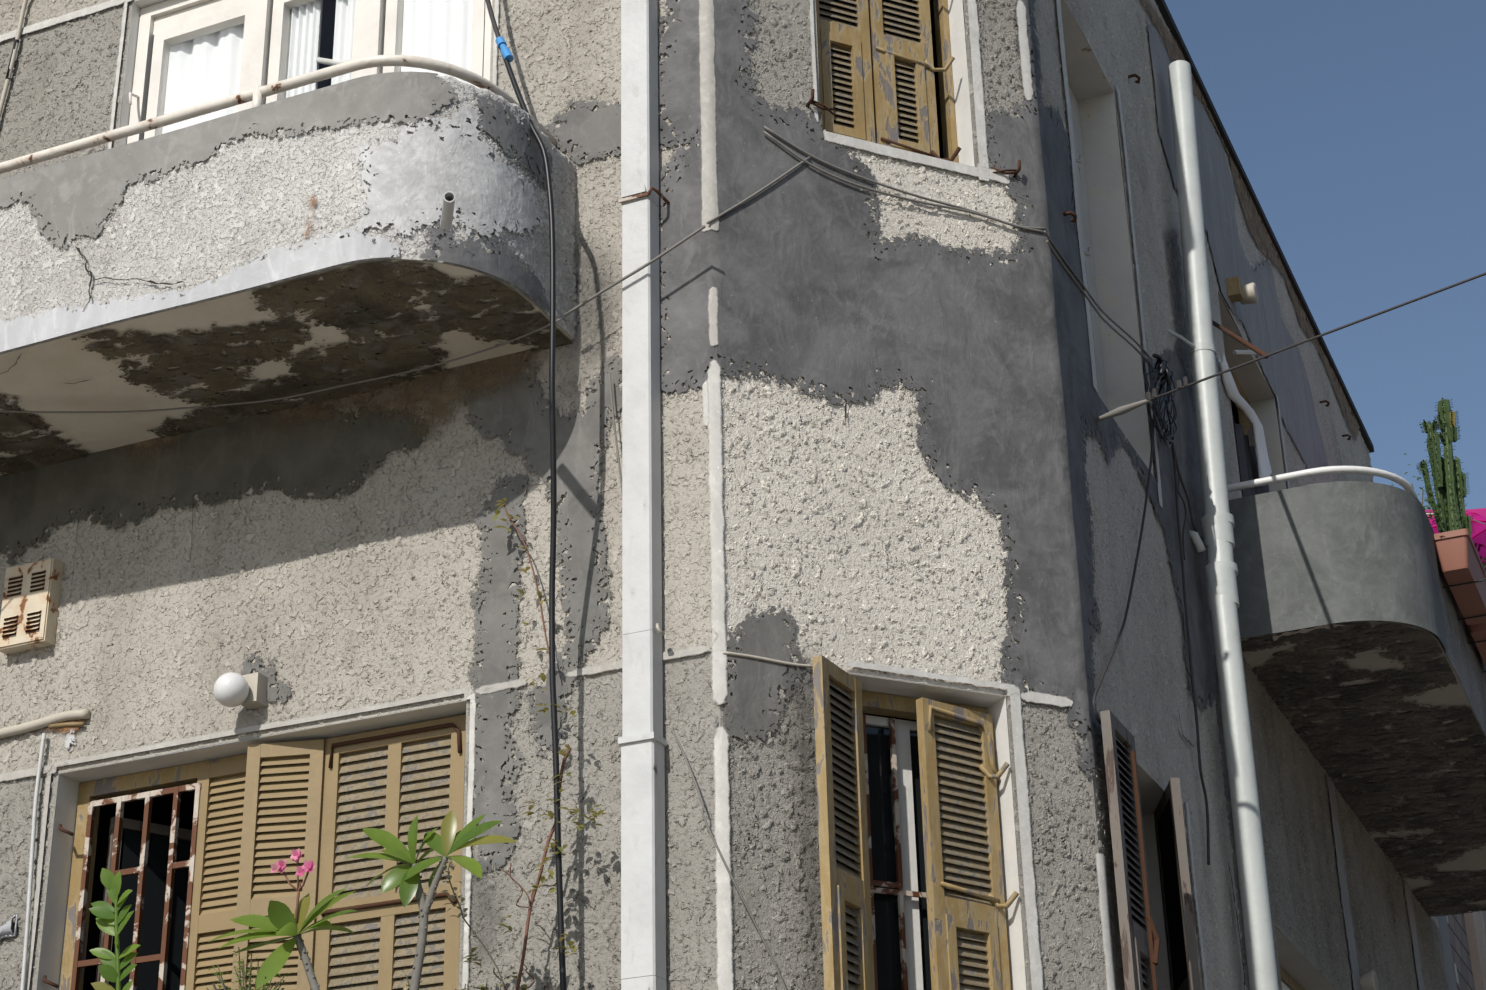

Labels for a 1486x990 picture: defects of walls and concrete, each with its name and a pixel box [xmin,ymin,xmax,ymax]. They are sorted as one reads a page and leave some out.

flaking render [0,101,573,438]
flaking render [0,394,89,476]
flaking render [1241,623,1486,924]